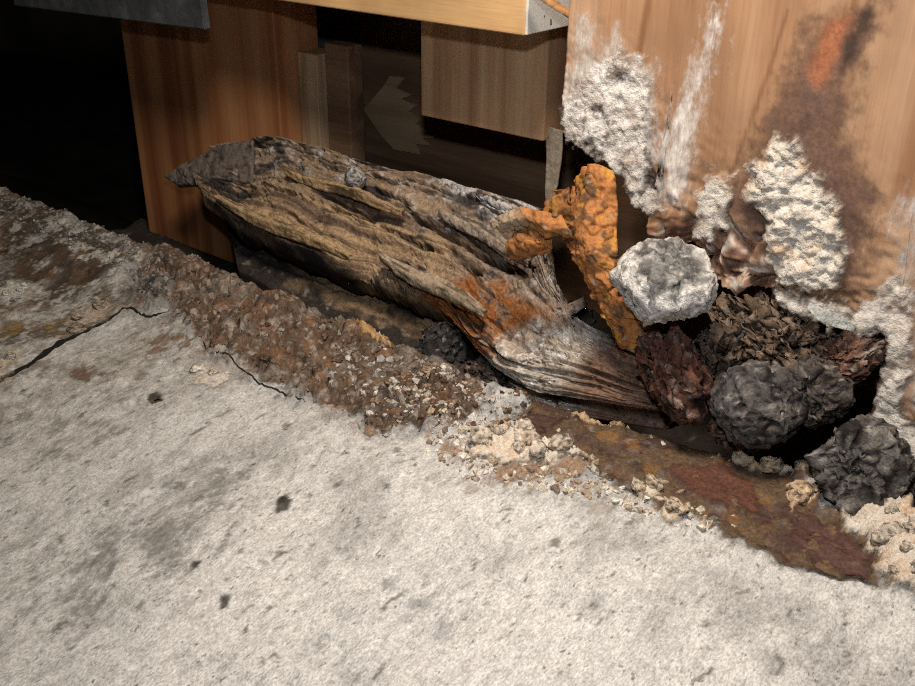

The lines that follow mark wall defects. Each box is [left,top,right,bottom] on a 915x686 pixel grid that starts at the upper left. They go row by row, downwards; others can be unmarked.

damp [561,4,915,461]
crack [0,306,164,382]
crack [198,335,305,402]
spalling [136,242,482,436]
peeling [807,302,855,332]
spalling [276,495,292,512]
damp [630,474,690,525]
corrosion [513,395,893,587]
damp [718,448,822,511]
damp [842,492,915,587]